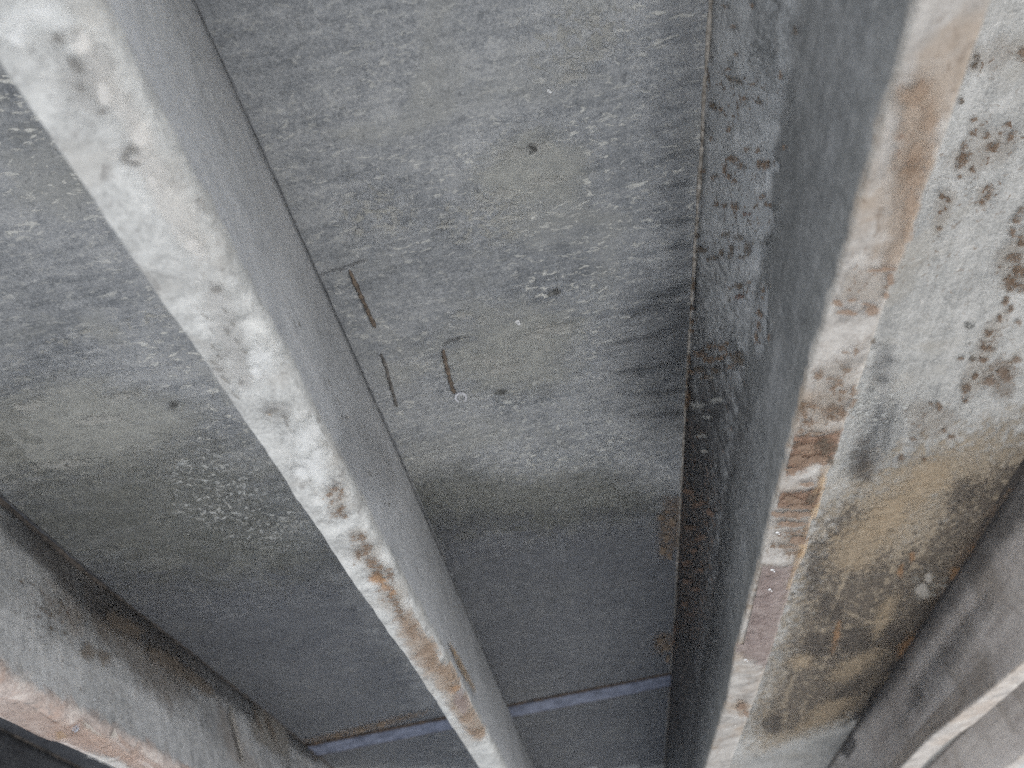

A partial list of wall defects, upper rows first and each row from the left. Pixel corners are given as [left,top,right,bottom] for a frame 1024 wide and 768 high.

rust [969,46,1024,80]
rust [694,52,787,264]
rust [945,117,1024,183]
rust [727,280,771,353]
rust [685,325,744,410]
rust [319,483,348,519]
rust [736,206,1024,750]
rust [350,532,486,740]